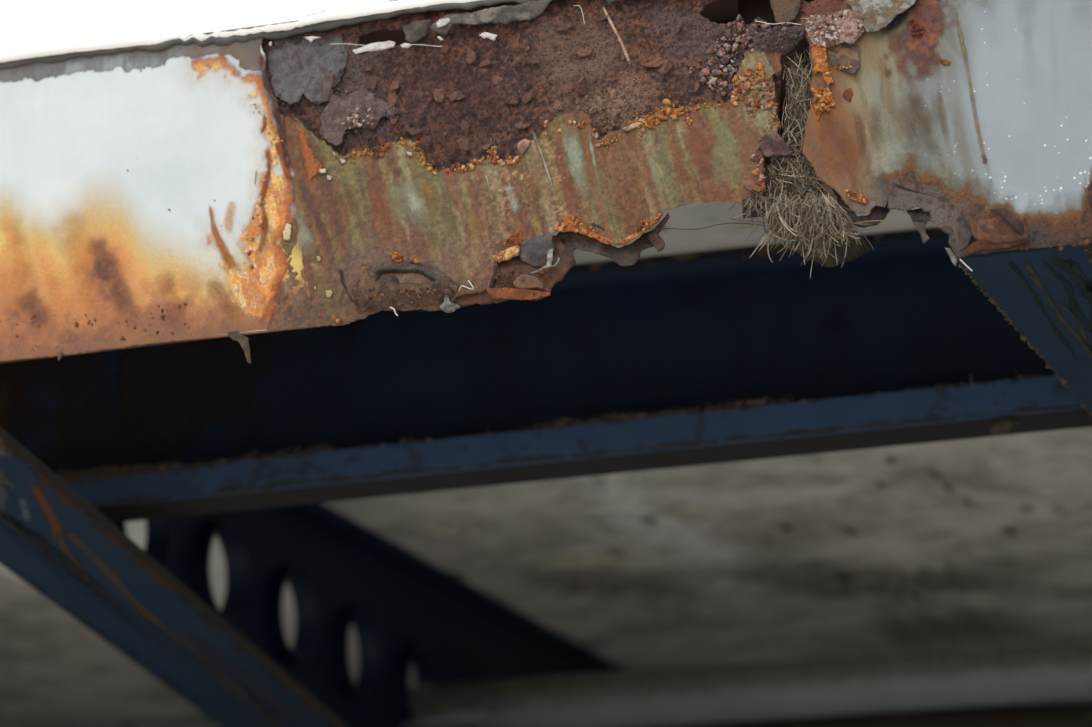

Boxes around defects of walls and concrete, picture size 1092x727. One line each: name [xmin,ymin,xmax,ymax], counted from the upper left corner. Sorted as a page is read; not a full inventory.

peeling [0,37,262,82]
rust [0,0,1092,361]
peeling [283,223,292,241]